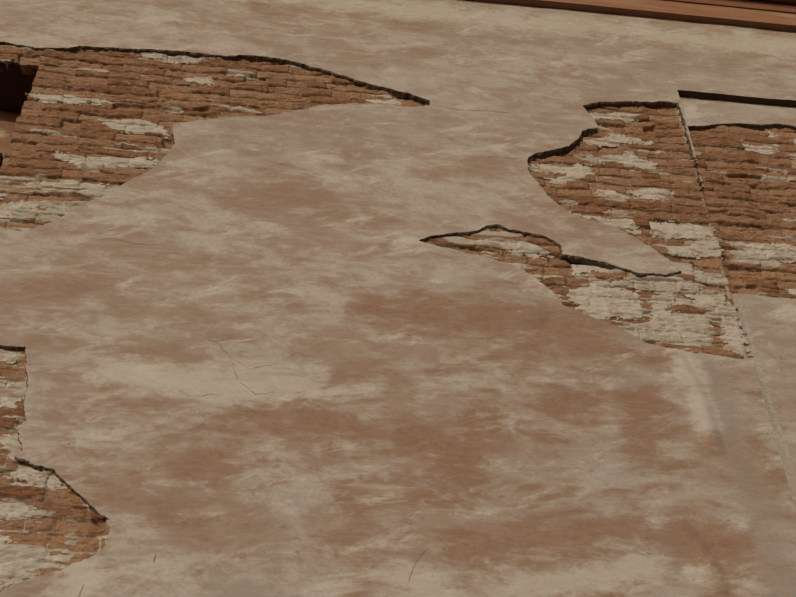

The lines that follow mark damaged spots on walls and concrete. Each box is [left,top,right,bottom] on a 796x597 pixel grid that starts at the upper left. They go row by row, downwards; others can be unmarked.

spalling [0,42,430,231]
spalling [419,101,796,359]
spalling [0,345,110,592]